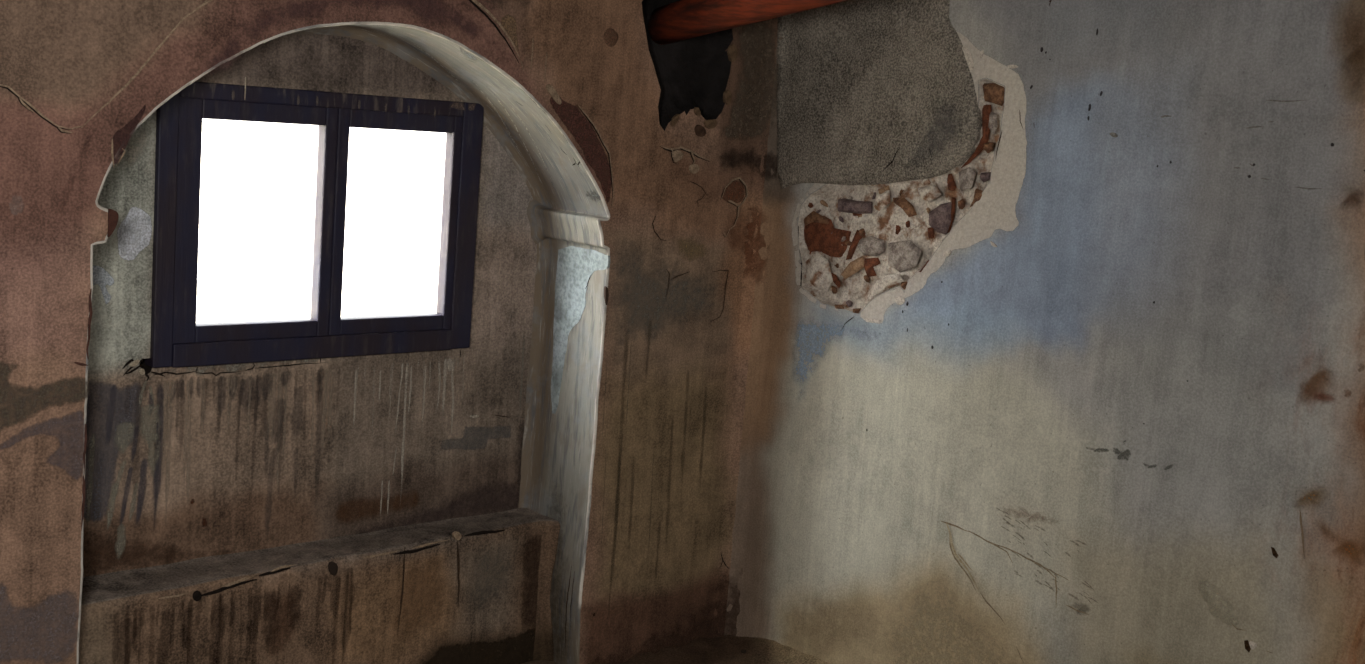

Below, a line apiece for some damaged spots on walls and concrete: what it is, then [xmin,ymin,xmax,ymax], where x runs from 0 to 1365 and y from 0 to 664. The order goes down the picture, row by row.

crack [0,84,81,134]
peeling [546,84,614,206]
spalling [641,0,738,174]
spalling [792,31,1033,324]
water stain [353,359,524,534]